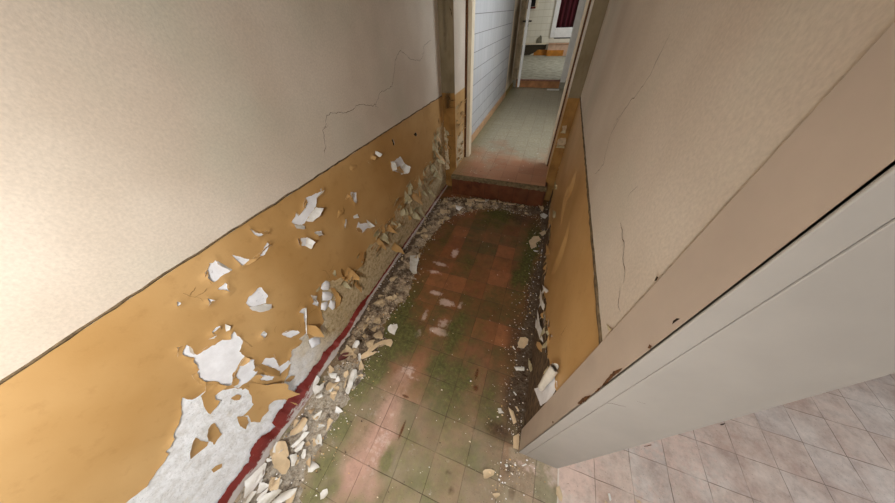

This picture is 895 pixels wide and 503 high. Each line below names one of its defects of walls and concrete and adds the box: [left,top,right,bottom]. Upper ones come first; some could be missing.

peeling [126,99,466,503]